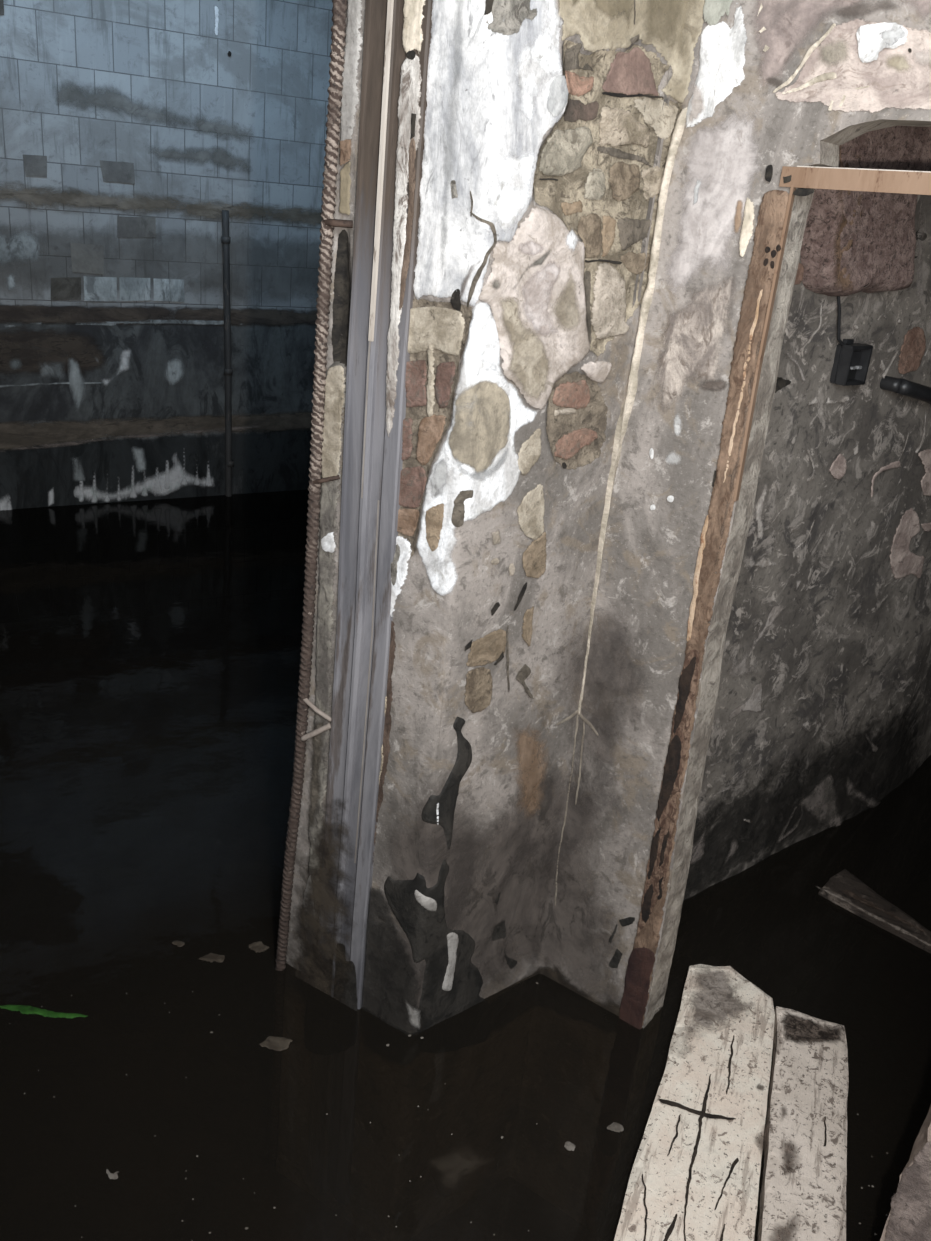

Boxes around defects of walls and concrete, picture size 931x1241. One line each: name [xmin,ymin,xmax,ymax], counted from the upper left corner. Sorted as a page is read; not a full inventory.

crack [460,191,497,307]
peeling [385,0,931,558]
peeling [746,558,773,567]
flaking render [890,508,931,579]
peeling [753,605,783,645]
damp [569,617,640,766]
damp [291,717,621,1035]